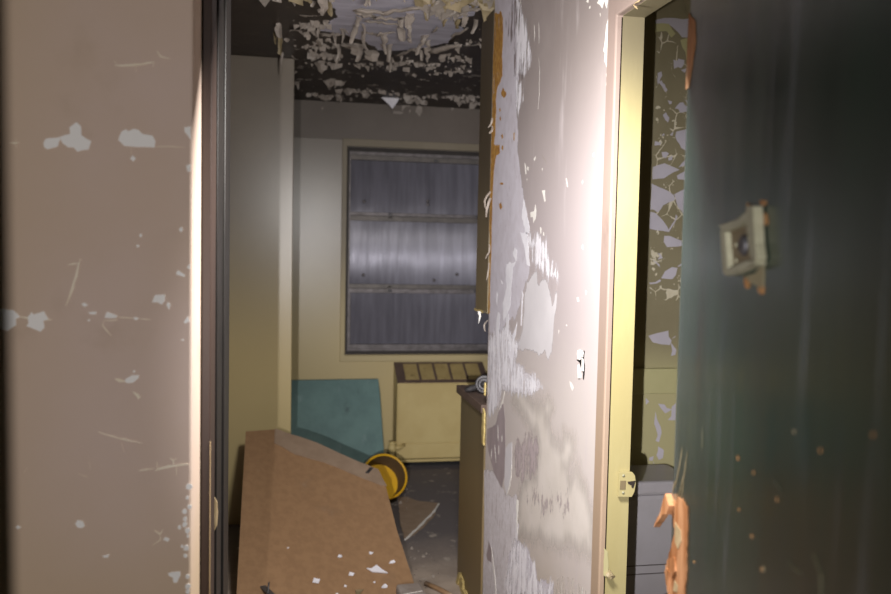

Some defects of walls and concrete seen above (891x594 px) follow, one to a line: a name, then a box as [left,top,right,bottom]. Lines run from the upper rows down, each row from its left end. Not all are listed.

spalling [43,122,91,152]
spalling [118,129,176,161]
peeling [650,0,688,285]
spalling [152,294,170,309]
spalling [259,0,593,594]
peeling [649,331,676,356]
peeling [646,399,676,465]